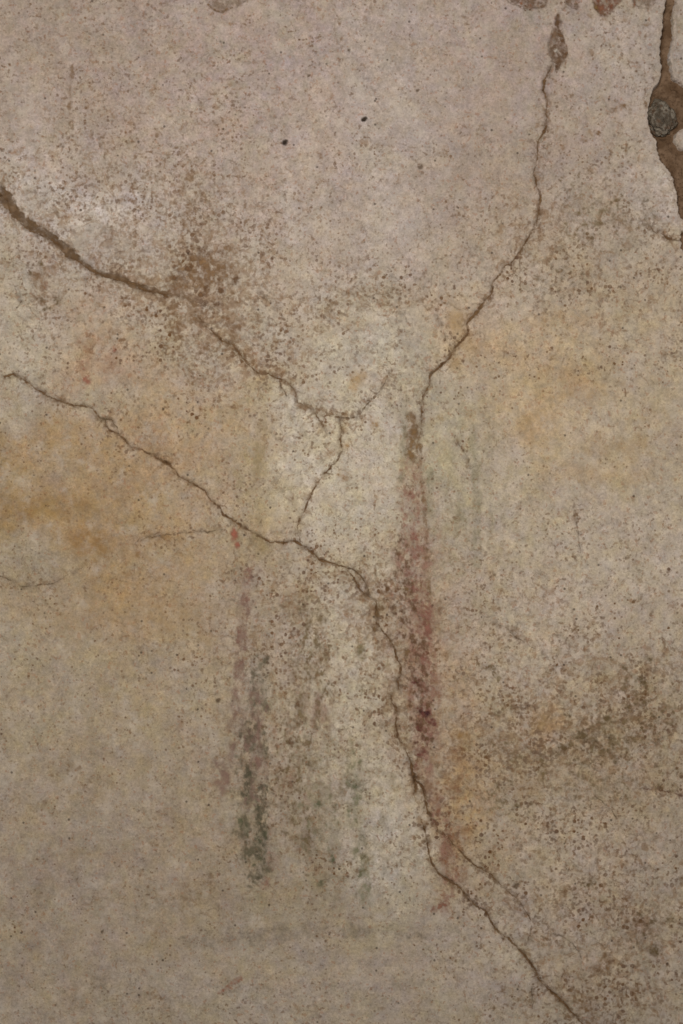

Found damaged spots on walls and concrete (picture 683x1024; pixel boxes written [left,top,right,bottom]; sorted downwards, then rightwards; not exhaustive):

crack [0,186,583,1024]
crack [420,66,552,424]